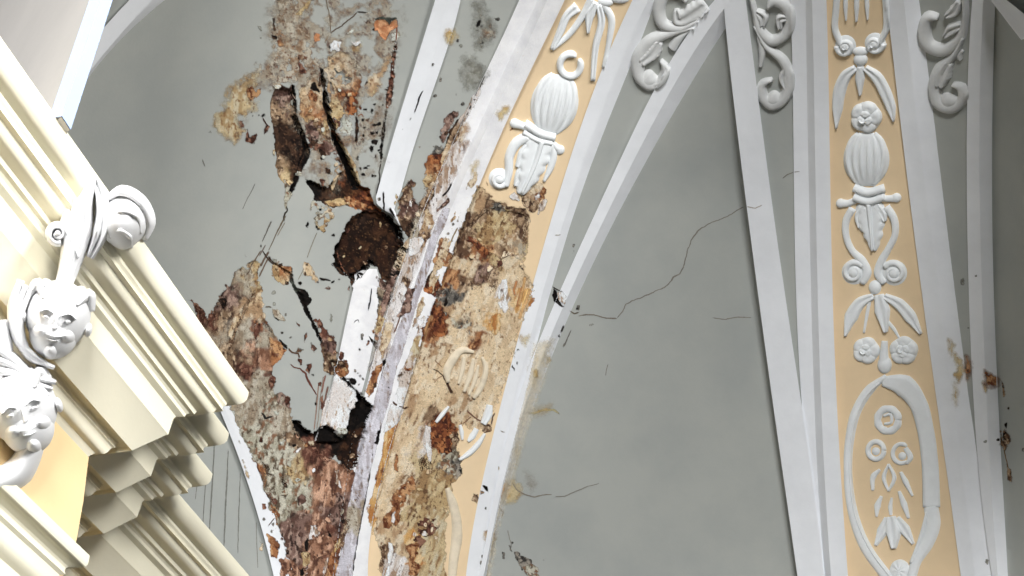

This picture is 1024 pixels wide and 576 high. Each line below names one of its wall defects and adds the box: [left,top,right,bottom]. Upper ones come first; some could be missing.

crack [310,21,423,193]
spalling [191,16,539,576]
crack [580,205,761,326]
corrosion [984,370,1009,409]
corrosion [997,423,1013,482]